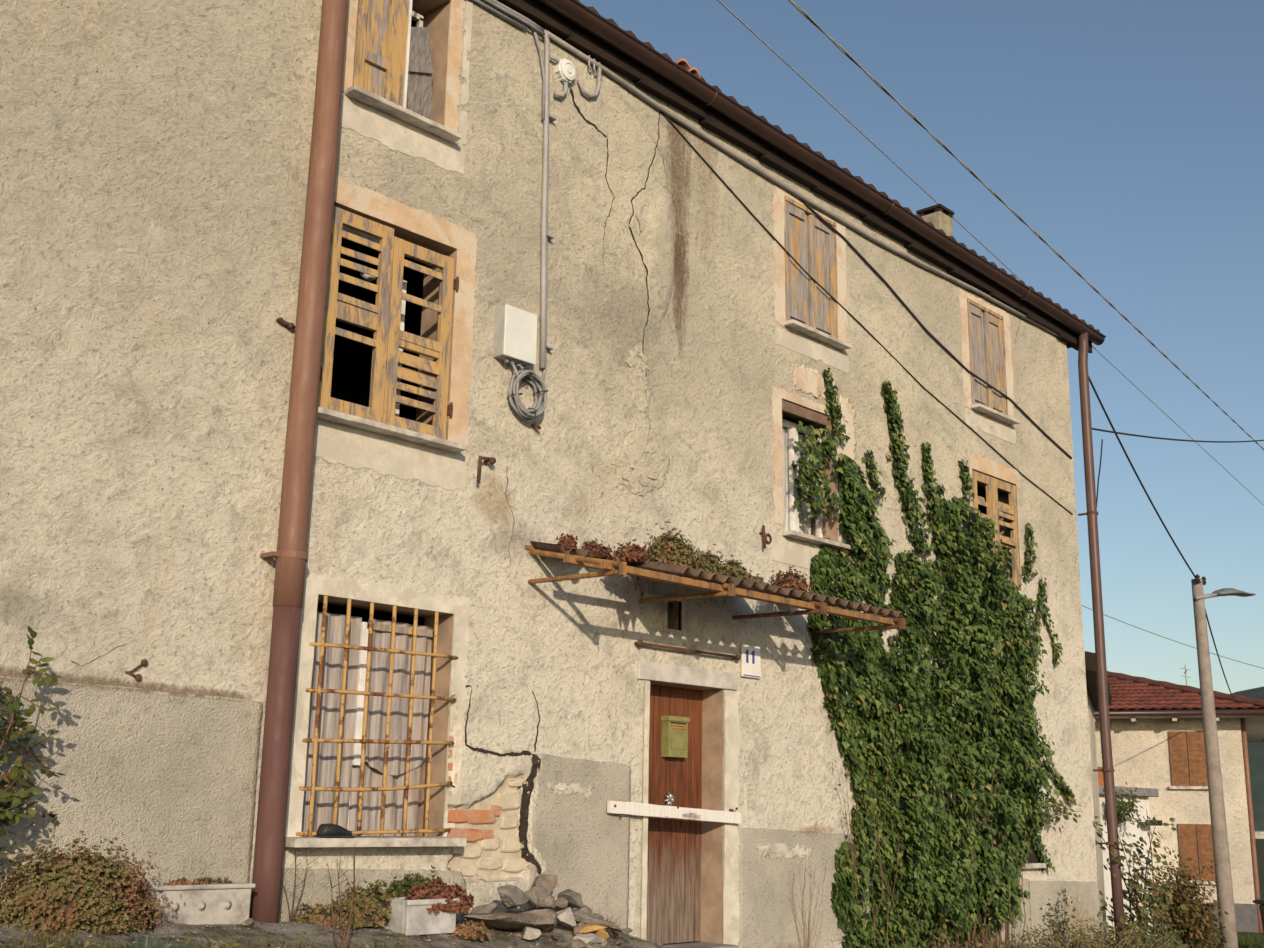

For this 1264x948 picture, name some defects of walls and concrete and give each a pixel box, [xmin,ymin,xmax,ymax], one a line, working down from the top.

crack [570,88,665,497]
leakage [669,117,688,315]
spalling [446,697,532,882]
crack [465,685,546,874]